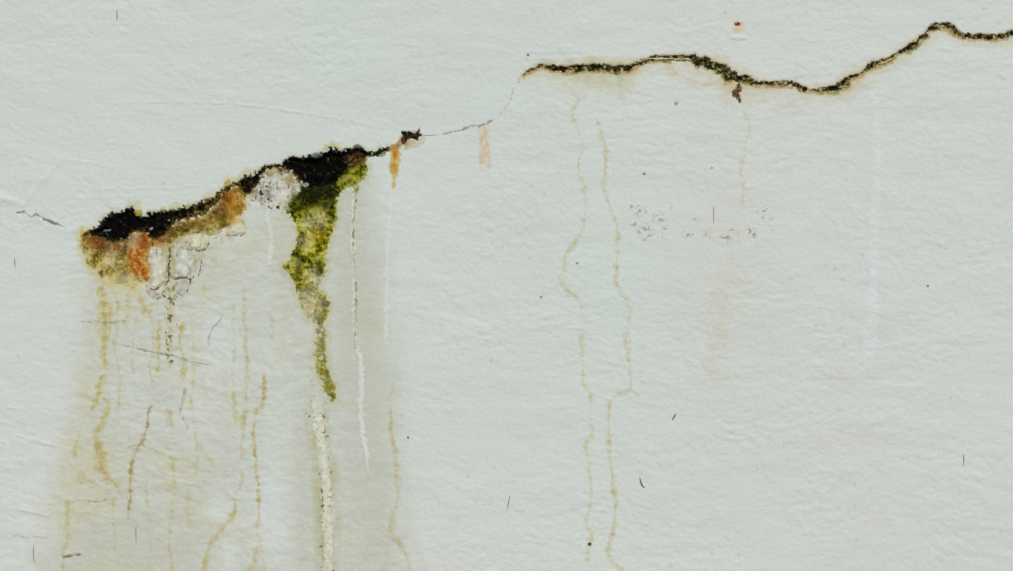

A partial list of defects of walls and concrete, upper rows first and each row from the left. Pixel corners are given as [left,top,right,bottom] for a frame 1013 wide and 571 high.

rust [171,173,252,238]
spalling [250,164,301,214]
rust [388,147,402,190]
crack [16,19,1013,256]
rust [73,224,160,298]
spalling [143,221,248,310]
water stain [22,157,434,571]
water stain [558,89,673,571]